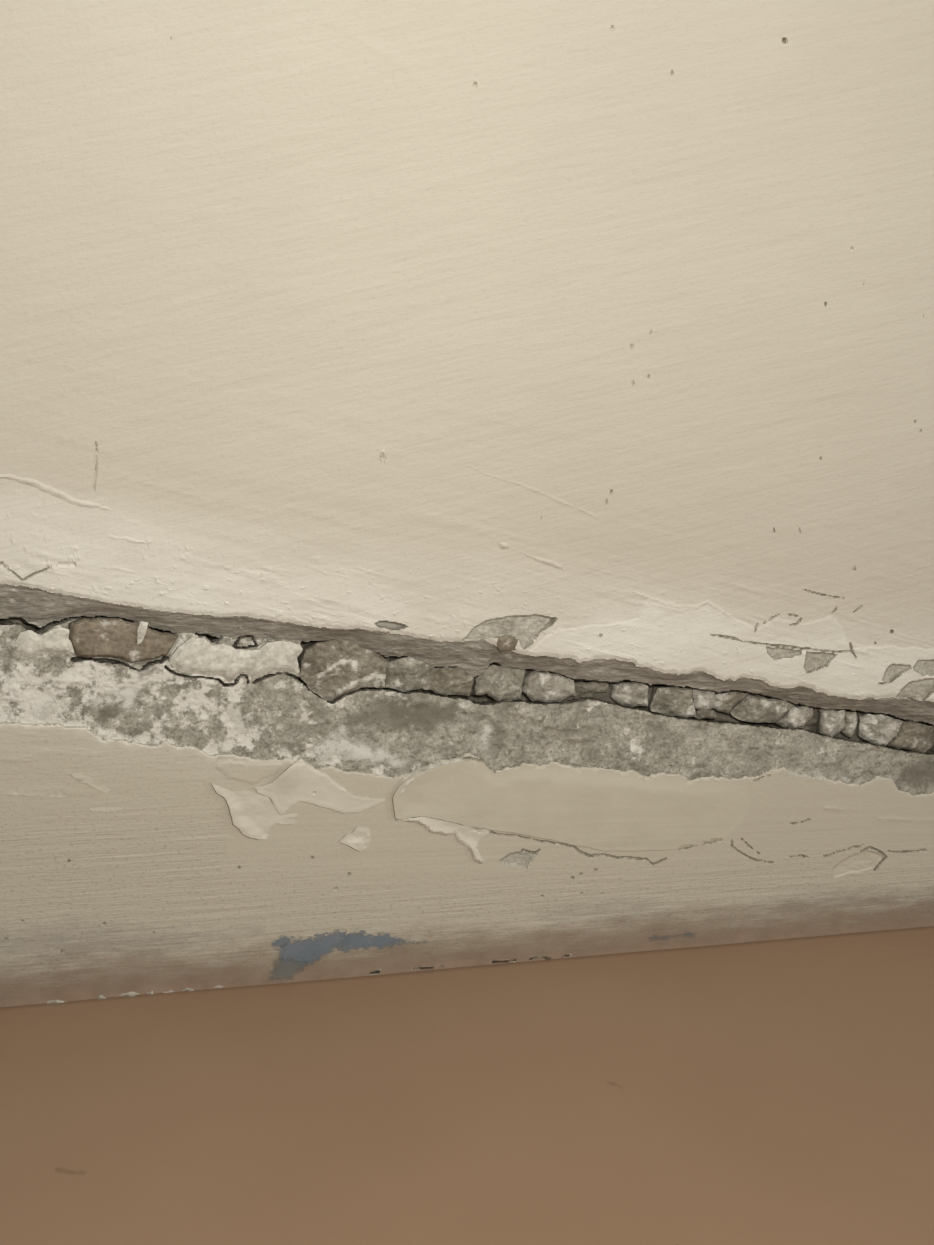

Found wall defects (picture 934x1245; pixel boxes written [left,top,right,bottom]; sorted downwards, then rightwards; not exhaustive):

crack [0,616,934,755]
spalling [0,585,934,869]
crack [457,757,496,773]
crack [490,832,926,866]